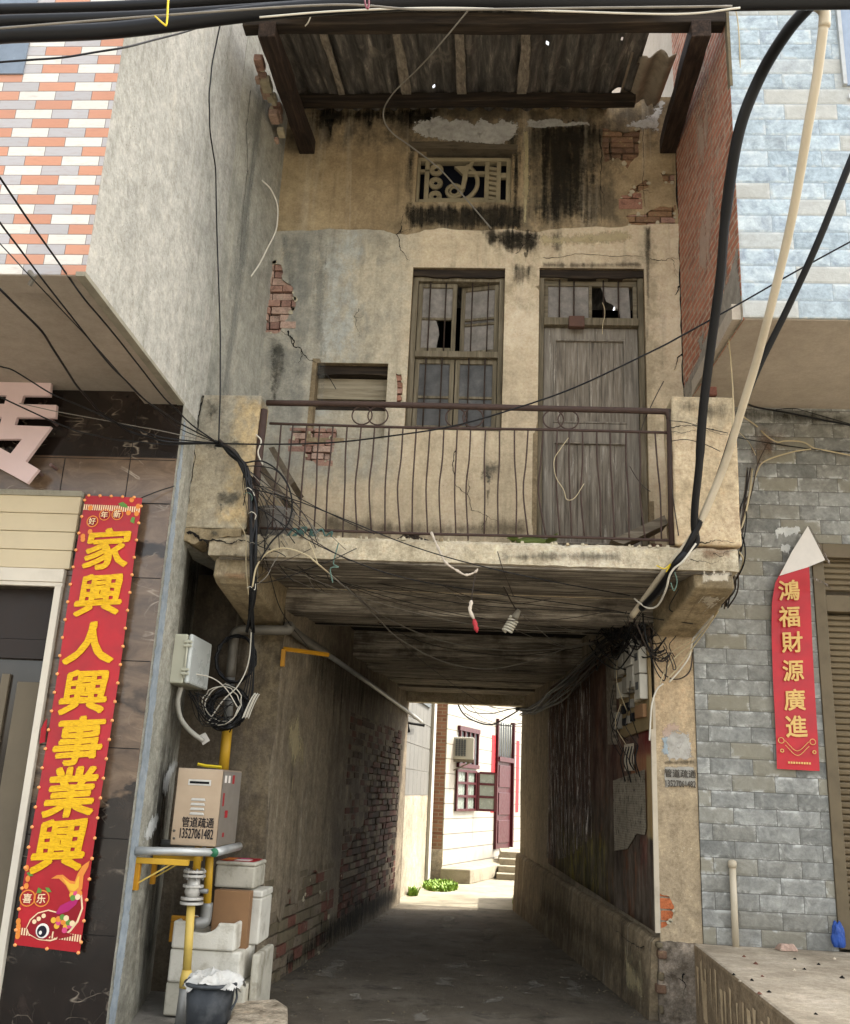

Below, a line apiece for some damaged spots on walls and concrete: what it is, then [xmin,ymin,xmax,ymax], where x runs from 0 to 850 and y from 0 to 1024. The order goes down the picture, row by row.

spalling [254,54,286,144]
leakage [312,108,437,137]
peeling [412,100,665,168]
leakage [405,120,611,279]
spalling [541,171,676,244]
spalling [266,260,298,334]
crack [283,330,315,363]
spalling [288,428,337,466]
crack [186,531,249,550]
peeling [662,729,692,760]
spalling [655,894,675,1014]